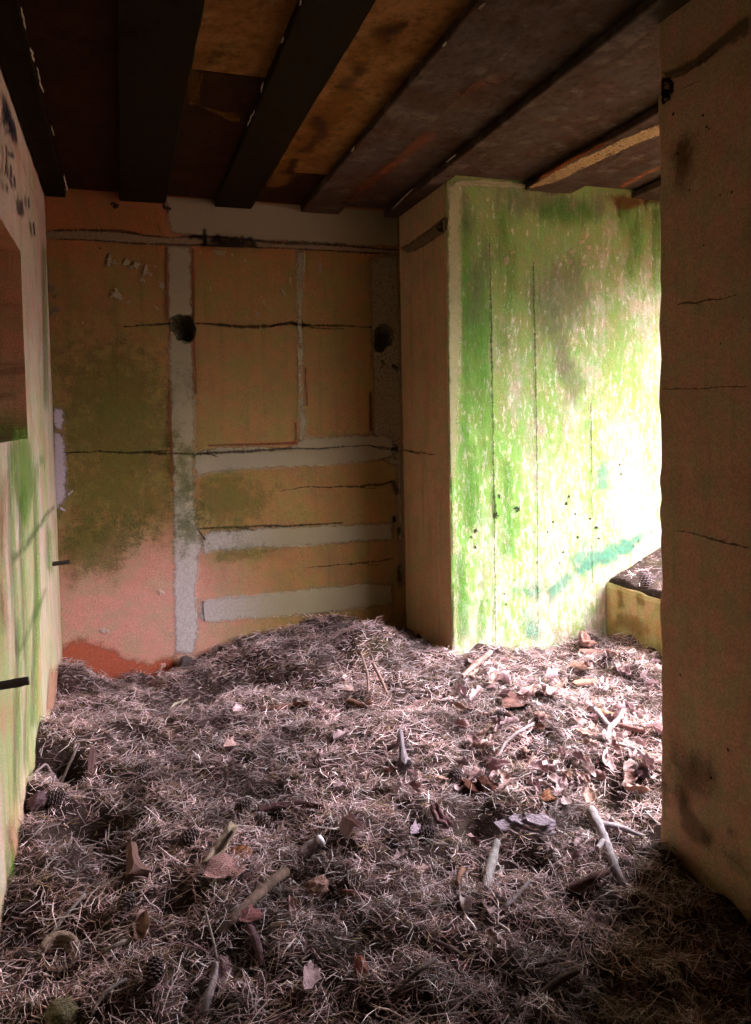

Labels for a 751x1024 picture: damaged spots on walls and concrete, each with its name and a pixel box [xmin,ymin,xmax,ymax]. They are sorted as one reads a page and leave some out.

crack [123,321,170,329]
crack [195,321,372,329]
flaking render [99,189,413,654]
crack [64,445,435,457]
crack [283,480,392,491]
crack [198,522,343,540]
crack [681,531,749,548]